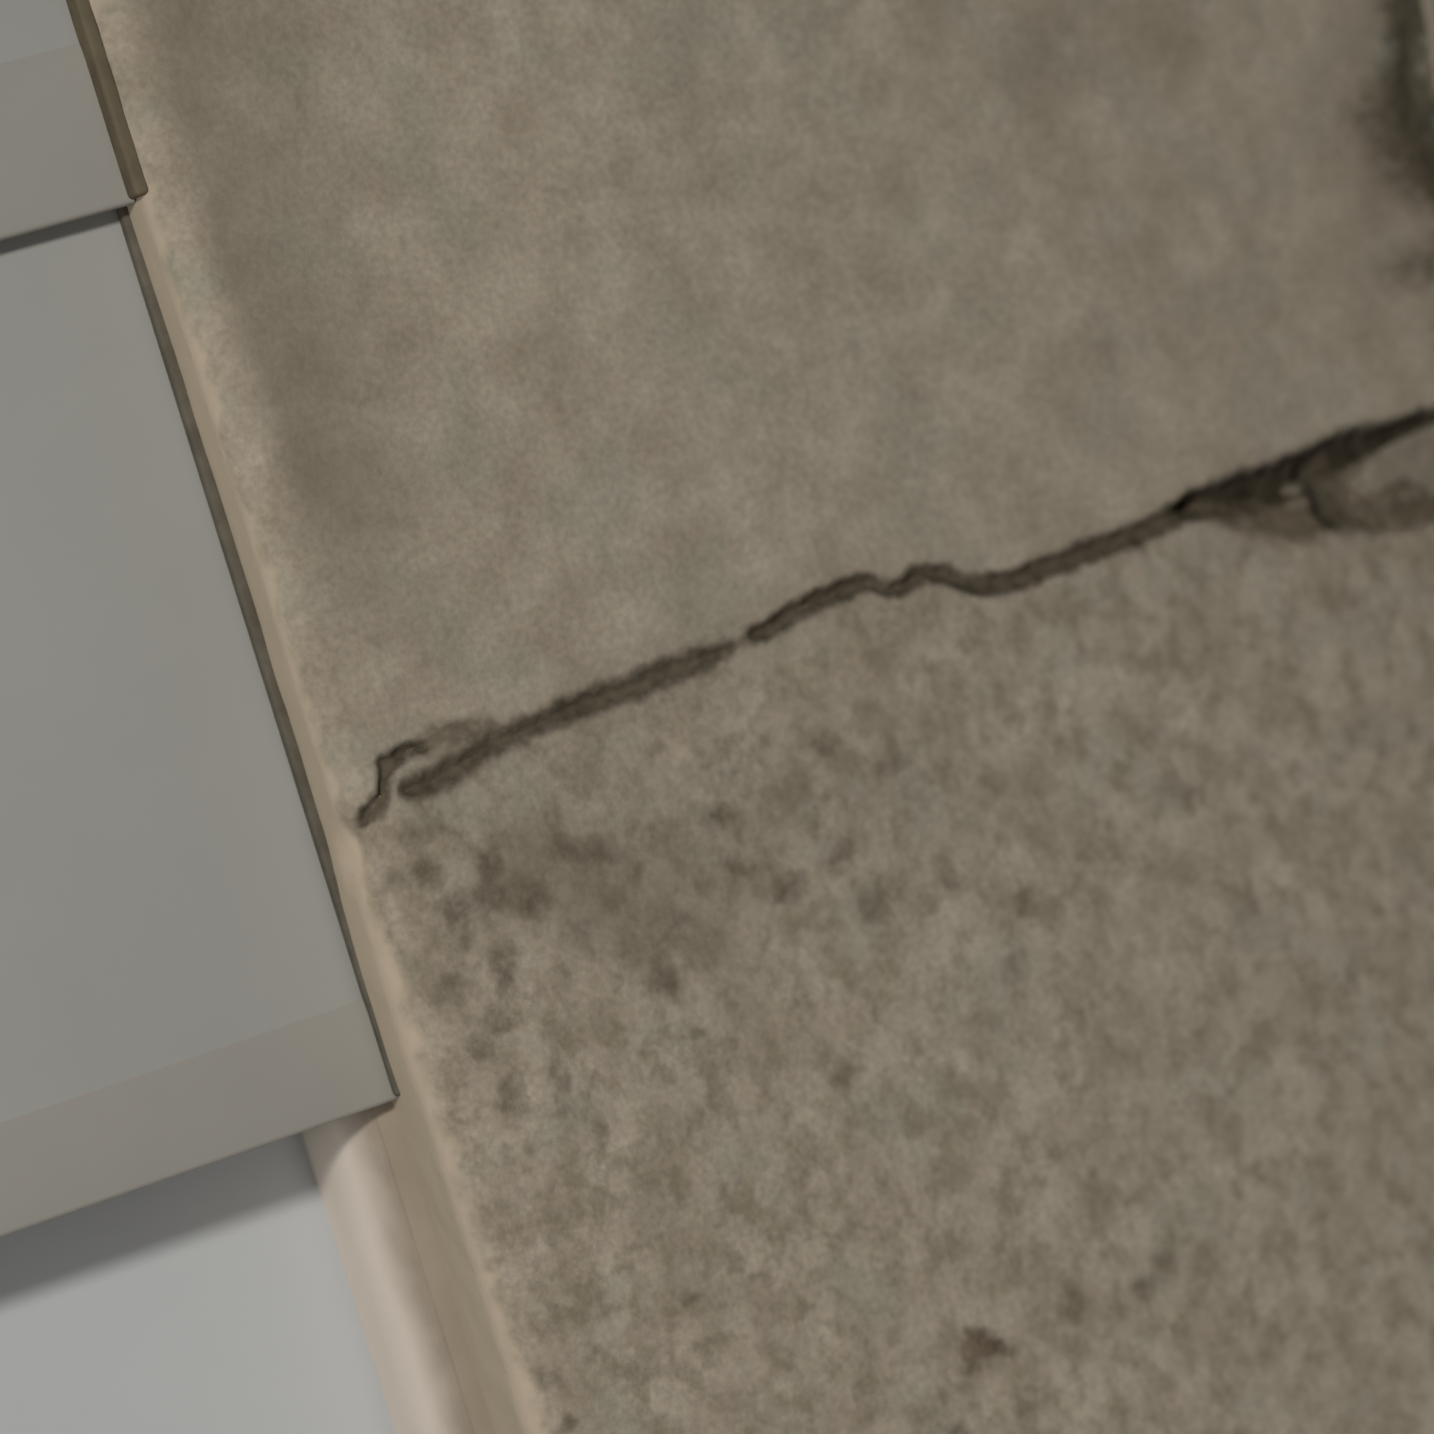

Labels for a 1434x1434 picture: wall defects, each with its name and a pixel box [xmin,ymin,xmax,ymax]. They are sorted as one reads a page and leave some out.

crack [1360,0,1434,197]
crack [359,411,1434,827]